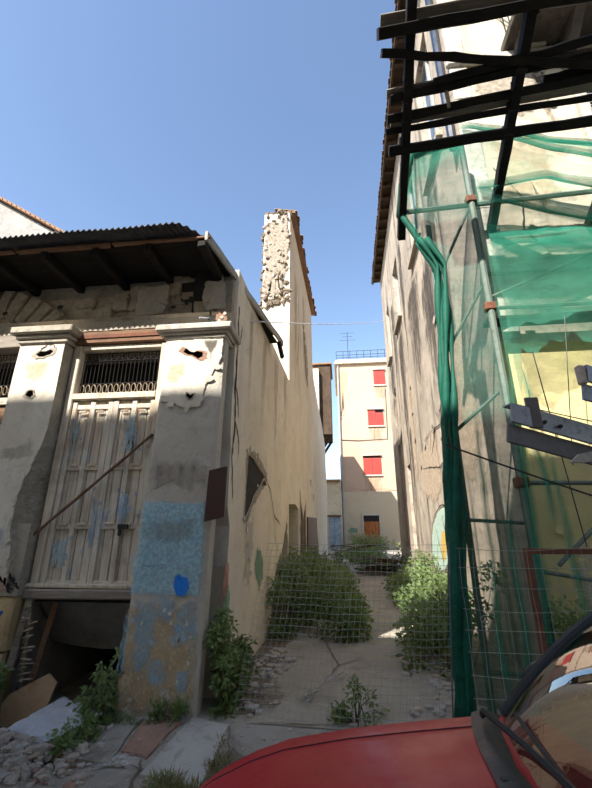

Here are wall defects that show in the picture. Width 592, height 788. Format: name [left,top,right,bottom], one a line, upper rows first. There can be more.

hole [31,344,57,359]
peeling [160,339,223,412]
water stain [391,246,436,420]
spalling [0,428,59,590]
water stain [401,430,415,495]
crack [401,366,443,553]